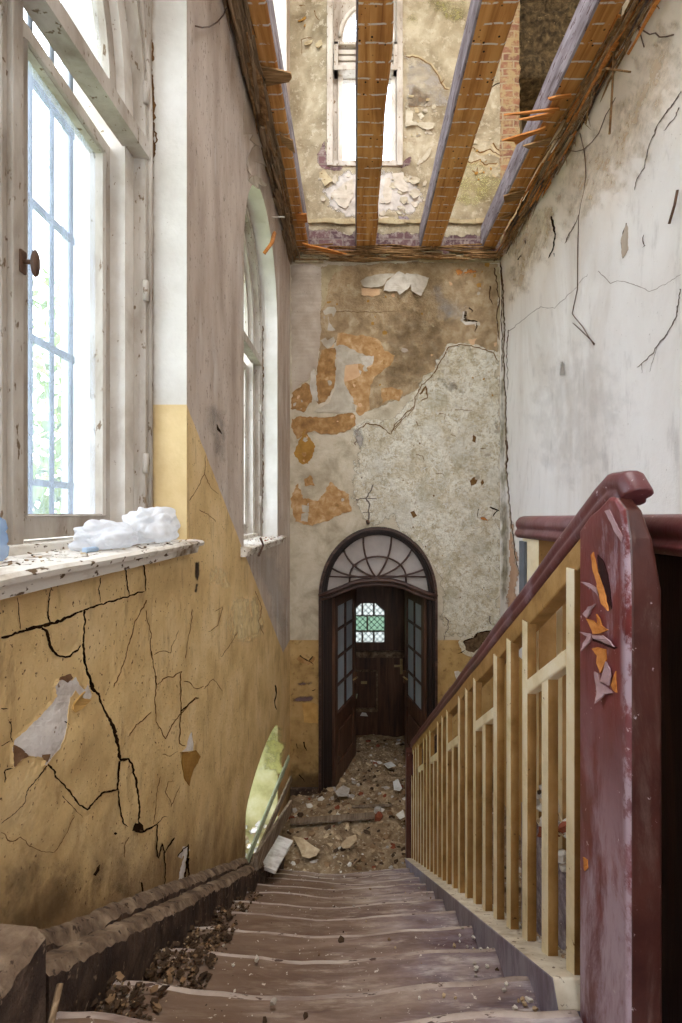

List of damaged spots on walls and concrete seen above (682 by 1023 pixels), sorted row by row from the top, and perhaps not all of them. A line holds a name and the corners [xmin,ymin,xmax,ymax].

crack [634,92,681,189]
flaking render [222,0,661,418]
crack [548,216,578,258]
flaking render [10,674,92,770]
crack [0,565,264,884]
flaking render [179,730,201,786]